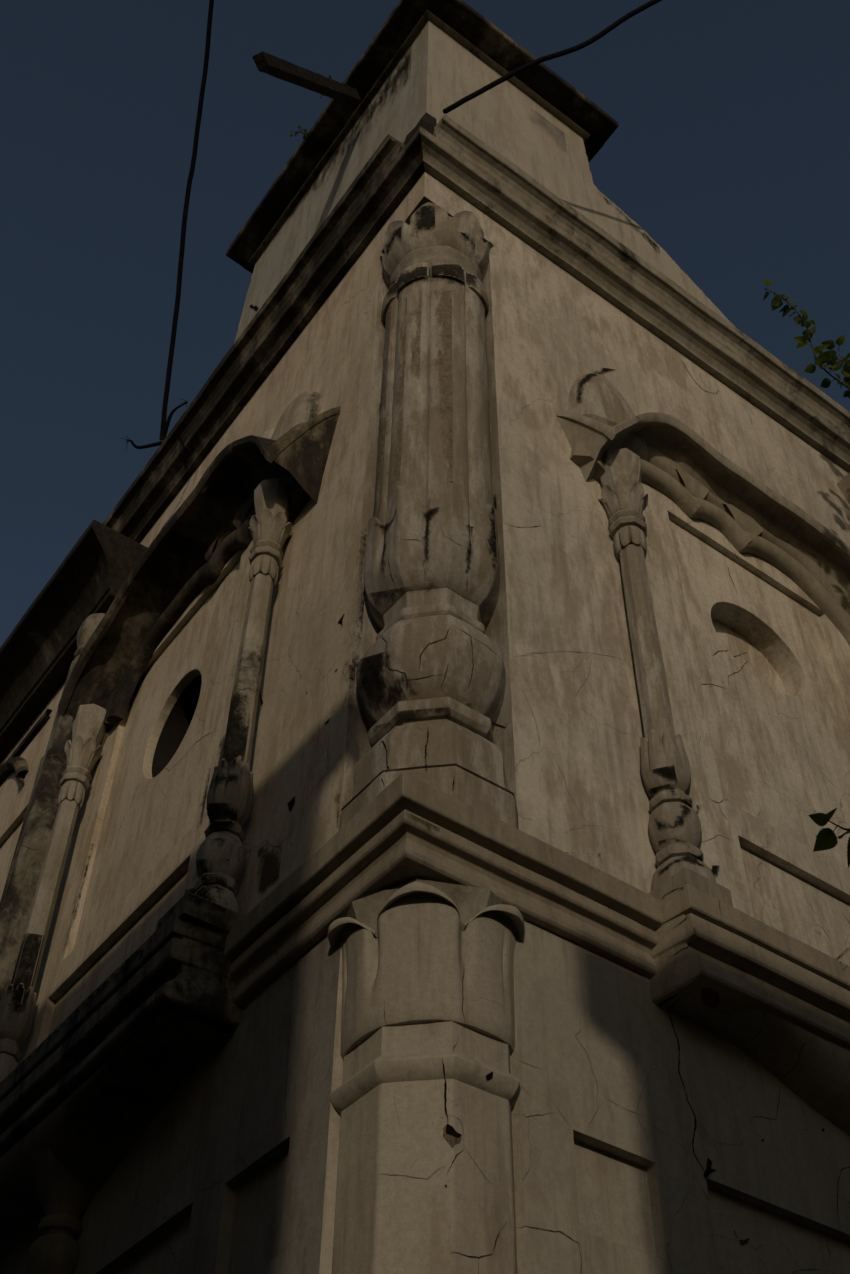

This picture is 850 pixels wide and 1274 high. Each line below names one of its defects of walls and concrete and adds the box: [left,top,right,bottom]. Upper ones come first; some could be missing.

mould [201,692,249,834]
crack [379,741,389,785]
crack [415,693,540,789]
crack [512,989,780,1271]
crack [450,1225,582,1274]